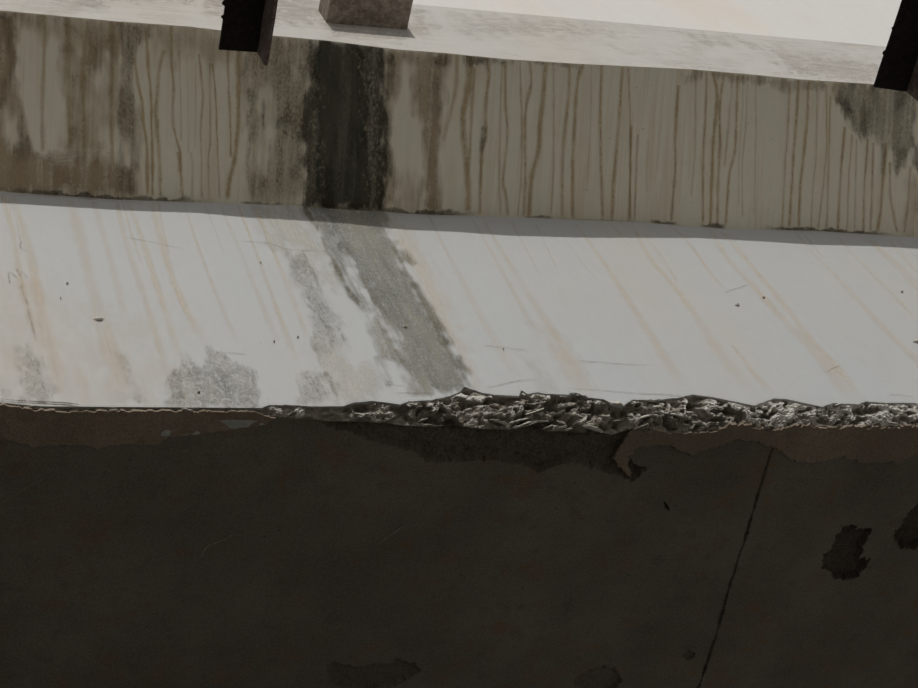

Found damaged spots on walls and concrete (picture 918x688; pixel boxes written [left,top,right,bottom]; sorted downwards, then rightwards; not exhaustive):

damp [0,15,23,129]
damp [0,136,131,194]
damp [66,22,161,194]
damp [417,56,448,210]
damp [465,128,486,210]
damp [461,56,494,147]
spalling [0,351,918,483]
crack [697,449,773,688]
spalling [821,524,872,581]
spalling [893,503,918,550]